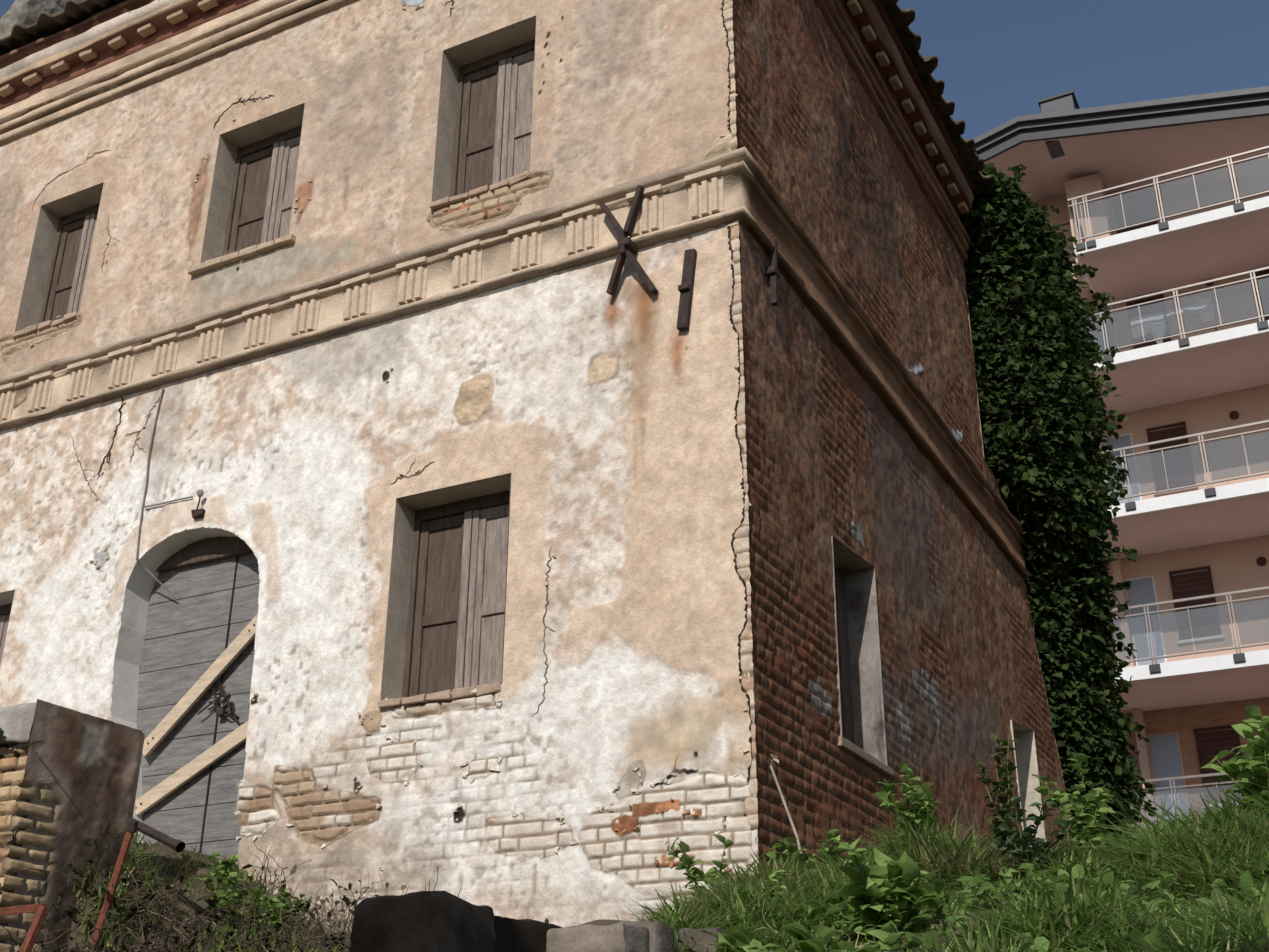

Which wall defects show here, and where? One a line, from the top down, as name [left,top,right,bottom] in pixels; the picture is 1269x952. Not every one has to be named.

flaking render [402,0,424,10]
crack [214,90,275,129]
spalling [426,171,552,230]
crack [72,390,164,503]
spalling [484,223,758,902]
crack [531,548,557,717]
spalling [234,688,503,848]